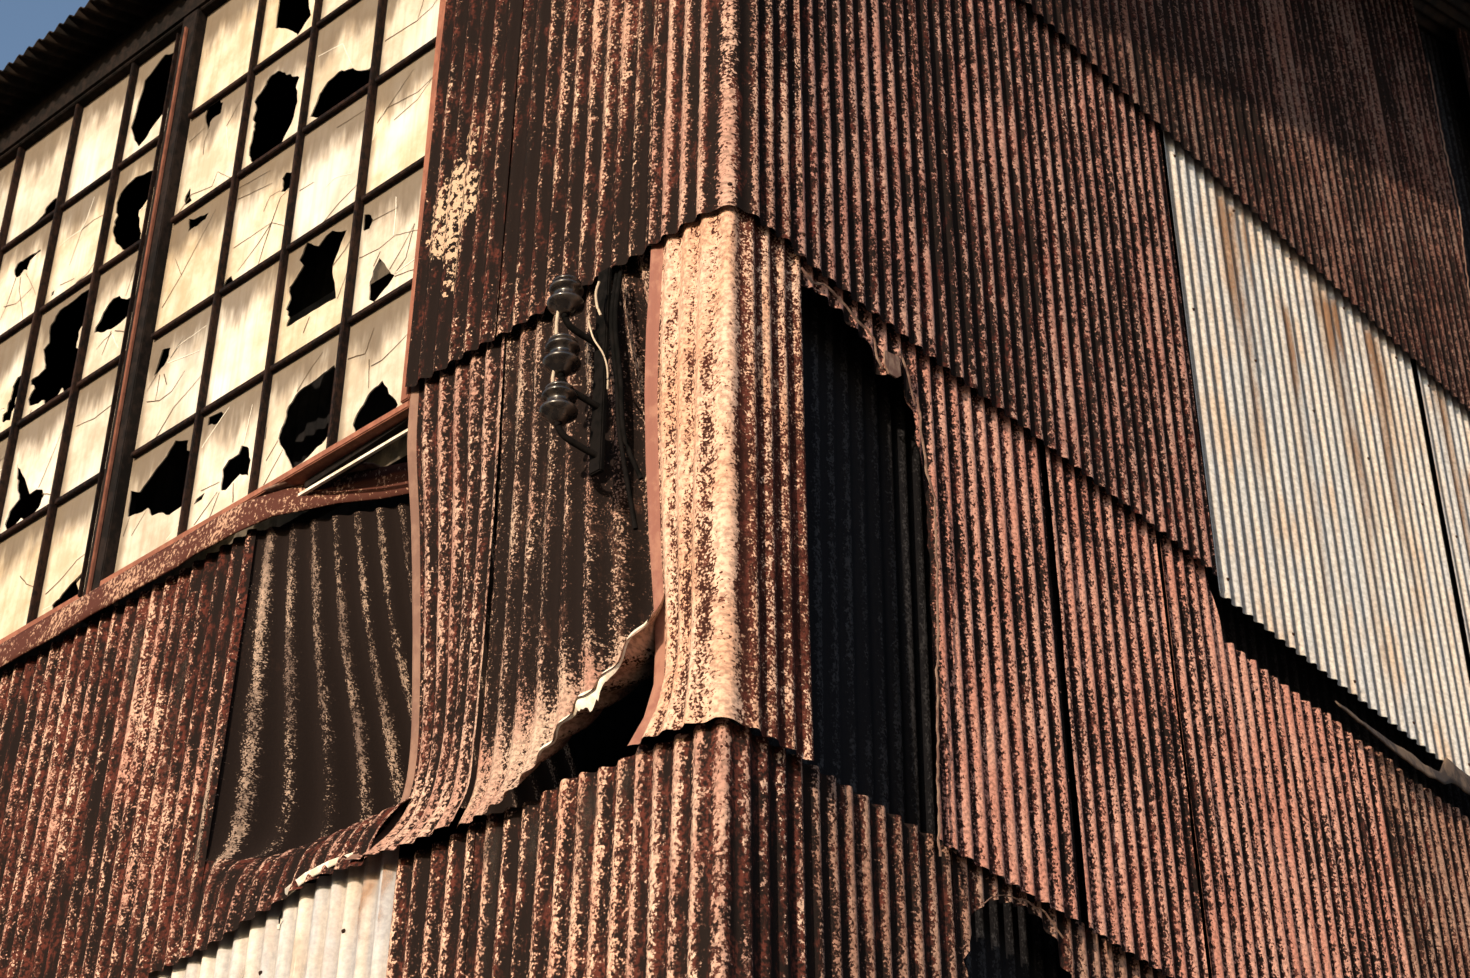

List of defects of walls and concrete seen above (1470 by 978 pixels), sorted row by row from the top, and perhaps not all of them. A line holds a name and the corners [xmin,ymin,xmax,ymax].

peeling [426,119,479,297]
corrosion [1216,198,1252,321]
corrosion [1282,307,1297,393]
corrosion [1314,296,1343,368]
corrosion [1363,331,1395,503]
corrosion [1435,389,1470,526]